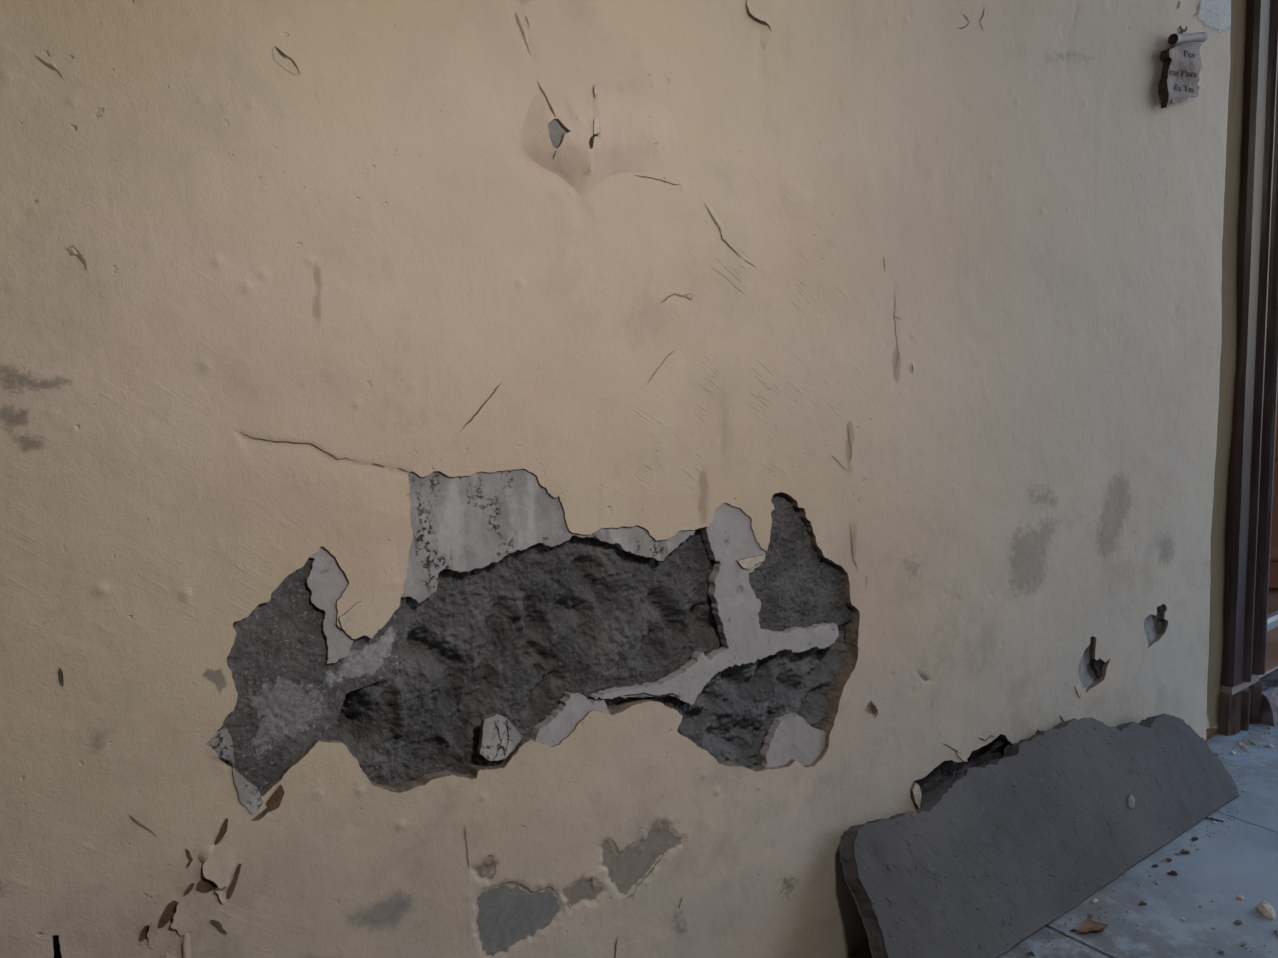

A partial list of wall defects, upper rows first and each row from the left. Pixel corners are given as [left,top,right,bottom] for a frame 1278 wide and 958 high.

crack [240,432,408,472]
flaking render [204,469,853,821]
flaking render [1075,637,1104,698]
flaking render [1144,604,1165,646]
flaking render [910,735,1013,812]
peeling [139,818,241,958]
peeling [475,822,682,955]